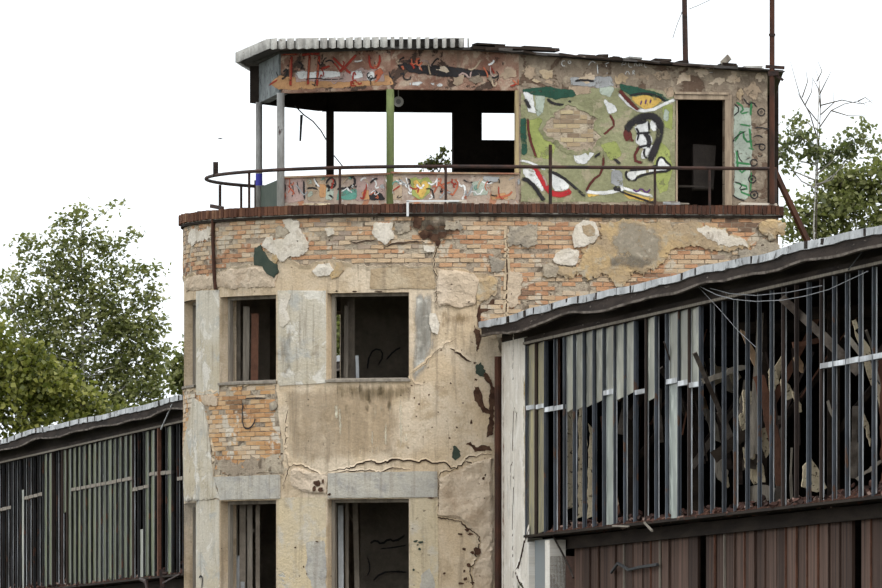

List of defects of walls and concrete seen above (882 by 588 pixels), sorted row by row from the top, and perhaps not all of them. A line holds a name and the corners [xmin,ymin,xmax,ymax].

flaking render [538,100,607,156]
flaking render [182,216,786,356]
flaking render [182,384,288,502]
crack [282,229,529,588]
flaking render [448,362,495,460]